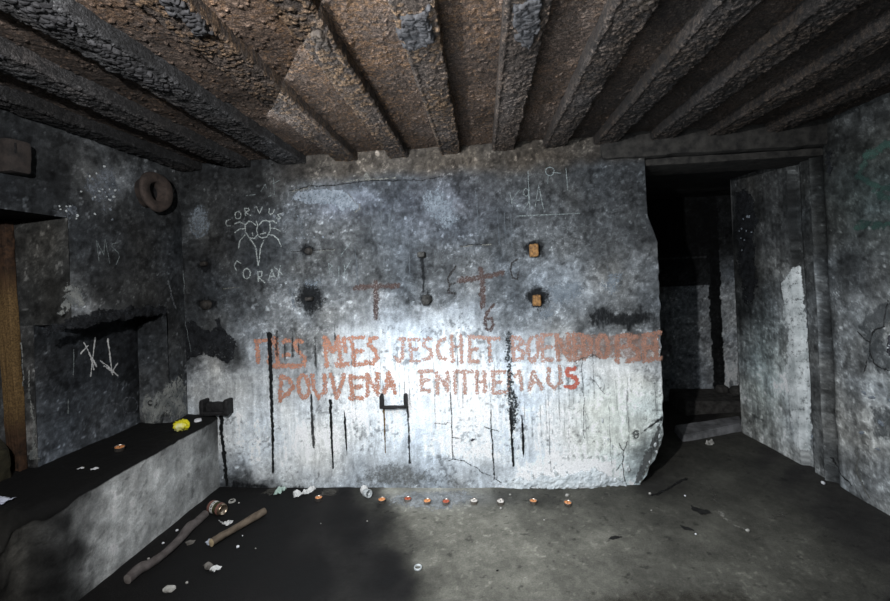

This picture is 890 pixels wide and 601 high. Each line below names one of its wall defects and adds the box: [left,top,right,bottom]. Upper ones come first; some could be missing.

spalling [42,284,168,336]